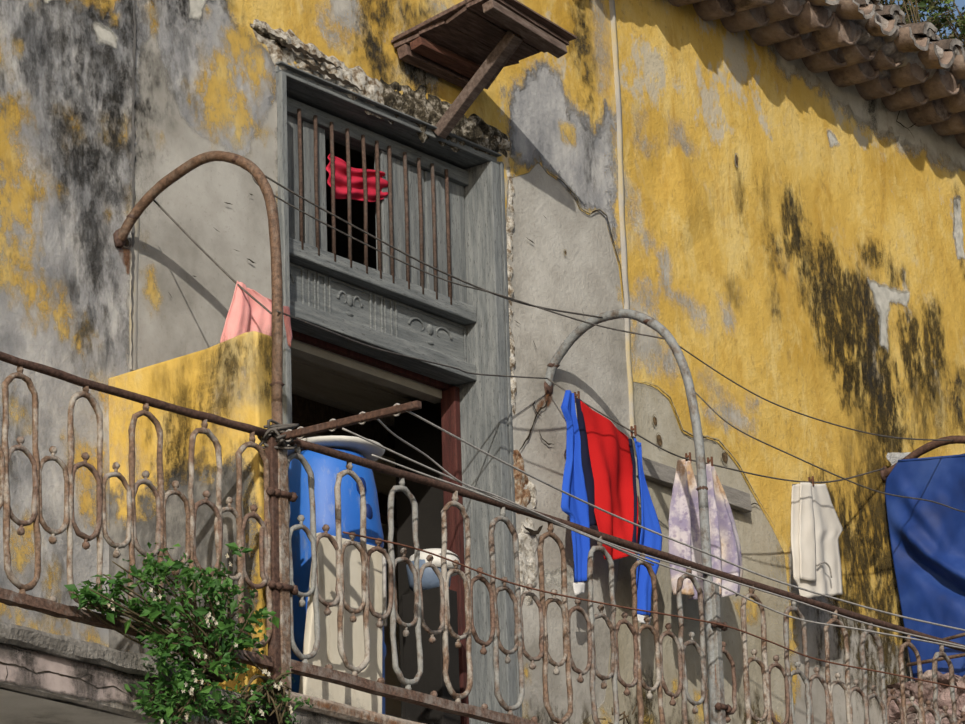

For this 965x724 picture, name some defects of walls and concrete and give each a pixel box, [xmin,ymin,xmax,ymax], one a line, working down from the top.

damp [75,10,141,166]
peeling [768,44,965,172]
peeling [953,196,965,259]
damp [200,340,239,414]
damp [259,338,272,396]
peeling [0,0,627,642]
peeling [618,251,705,371]
damp [771,191,962,465]
peeling [868,280,910,350]
damp [164,398,205,484]
peeling [0,604,207,668]
damp [828,476,910,710]